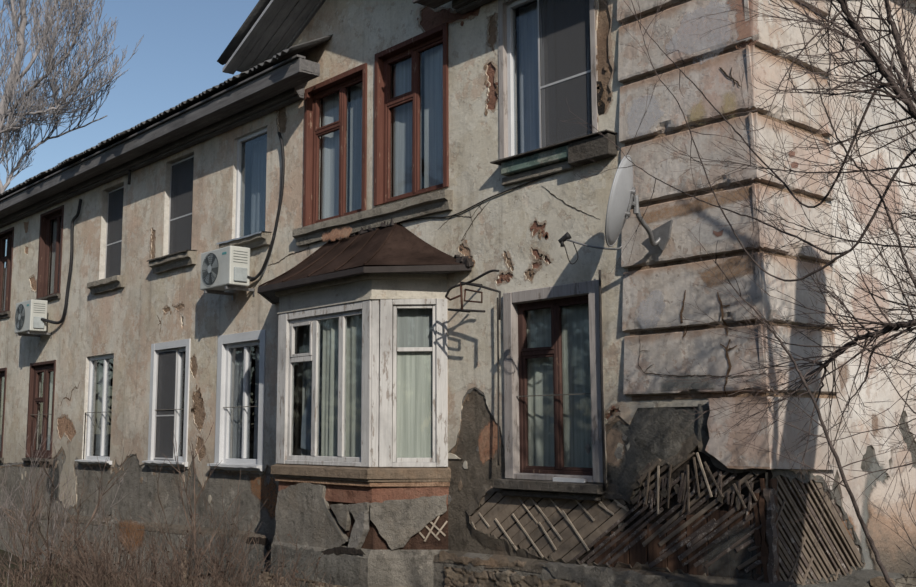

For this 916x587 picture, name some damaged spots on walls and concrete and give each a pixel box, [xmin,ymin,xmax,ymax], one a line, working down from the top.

flaking render [417,6,499,116]
flaking render [595,0,616,122]
flaking render [163,302,185,326]
flaking render [495,251,514,286]
flaking render [525,219,553,281]
crack [638,290,772,397]
flaking render [0,355,685,574]
flaking render [600,404,865,587]
flaking render [861,446,874,473]
flaking render [899,411,916,468]